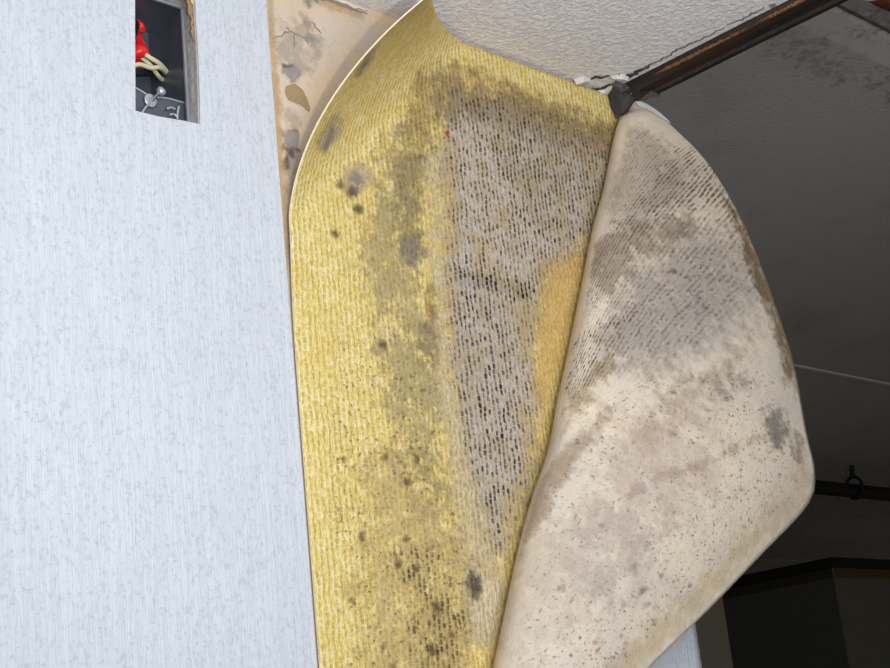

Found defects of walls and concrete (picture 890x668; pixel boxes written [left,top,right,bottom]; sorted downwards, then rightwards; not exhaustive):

spalling [282,64,310,112]
spalling [574,66,650,118]
damp [282,130,300,168]
damp [562,226,737,414]
damp [334,82,610,668]
damp [535,372,789,576]
damp [528,560,667,668]